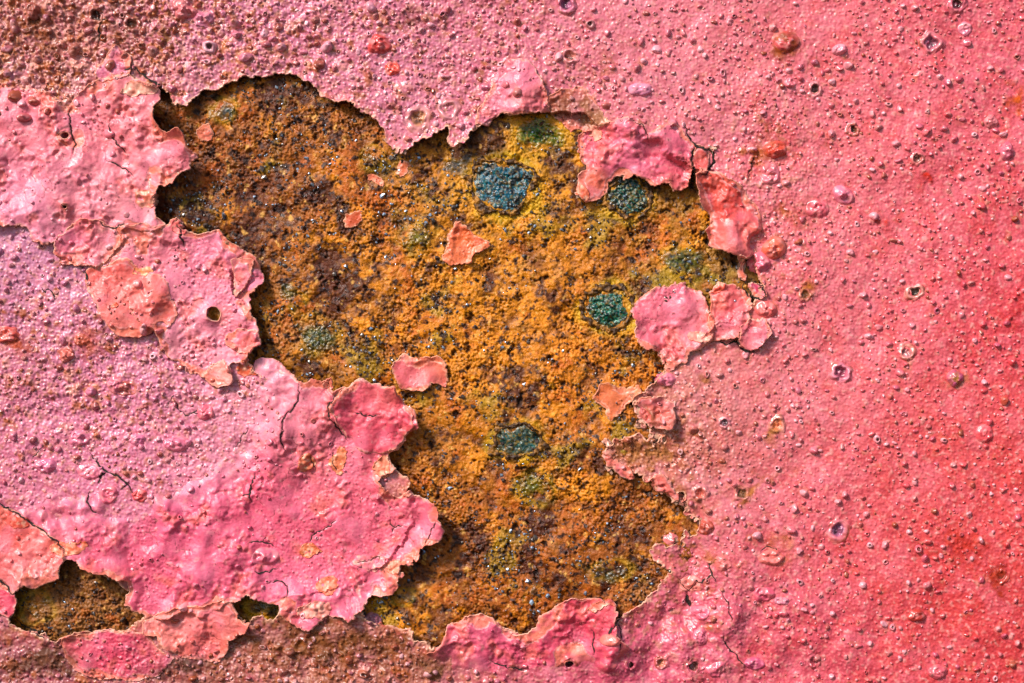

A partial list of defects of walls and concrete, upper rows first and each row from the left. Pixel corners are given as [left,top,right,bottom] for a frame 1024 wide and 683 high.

peeling [442,221,490,266]
peeling [475,58,773,372]
peeling [0,45,449,682]
corrosion [153,74,761,681]
peeling [592,382,676,431]
peeling [602,451,635,480]
peeling [650,474,687,501]
corrosion [9,560,144,676]
peeling [426,598,633,682]